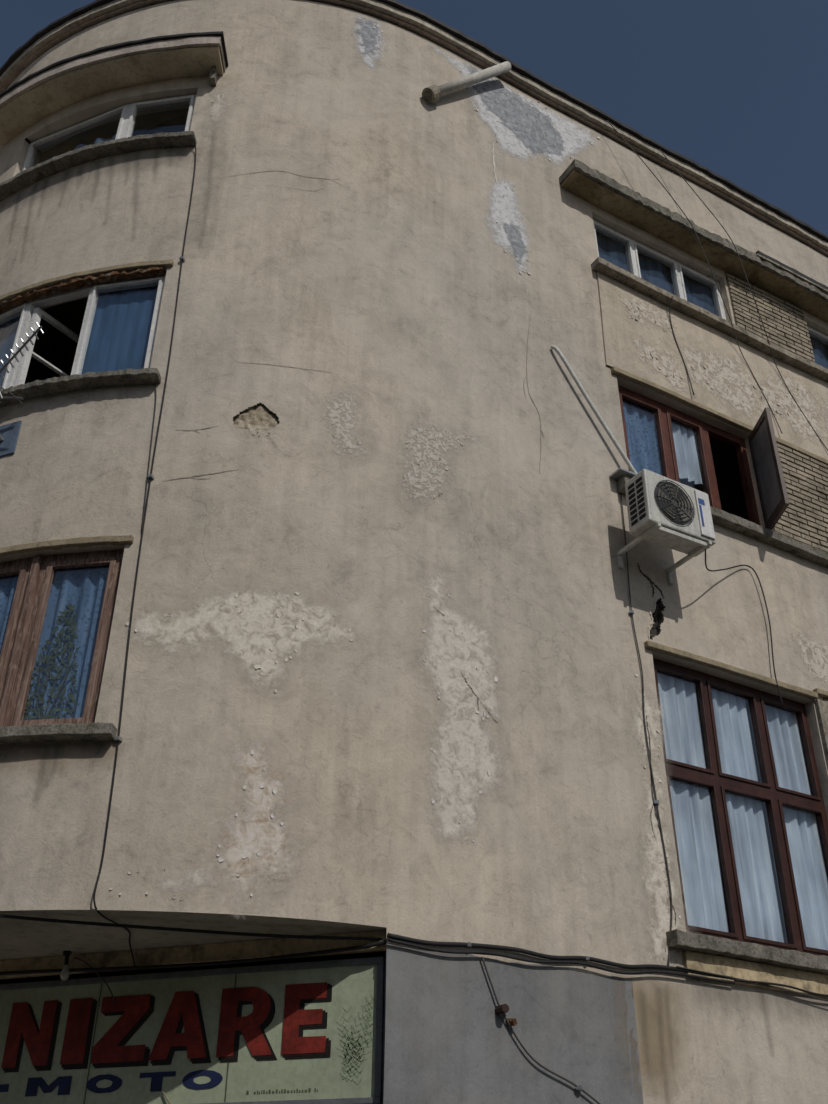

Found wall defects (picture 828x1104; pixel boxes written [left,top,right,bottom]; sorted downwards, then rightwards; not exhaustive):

peeling [355,18,385,68]
peeling [435,48,600,274]
spalling [233,403,280,439]
peeling [403,419,478,503]
peeling [126,589,355,693]
crack [637,563,666,640]
peeling [421,573,502,842]
peeling [160,743,300,905]